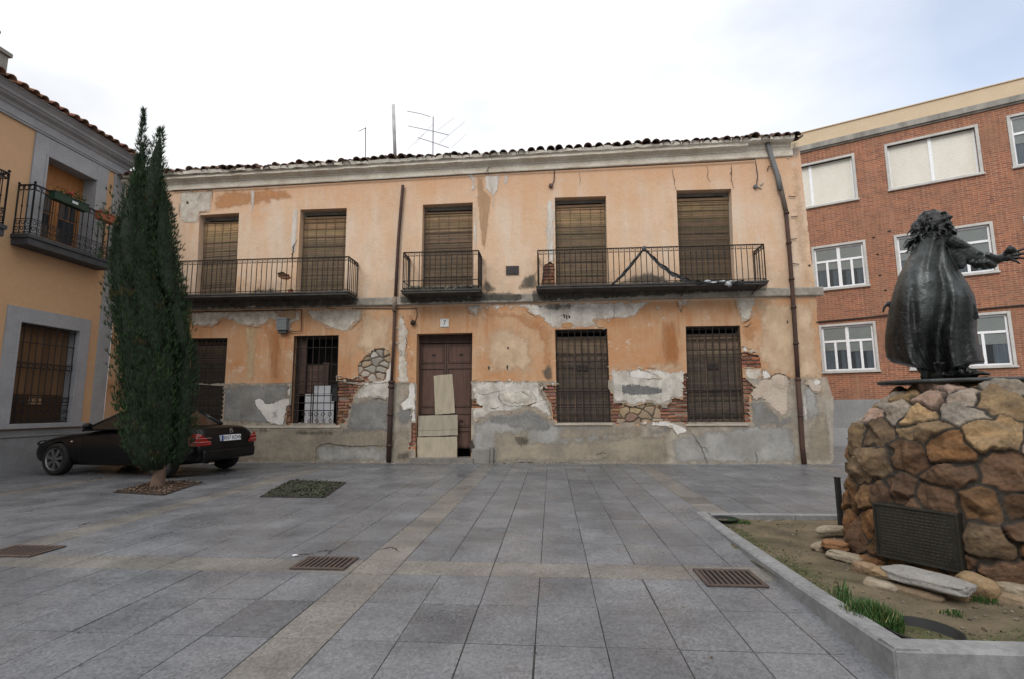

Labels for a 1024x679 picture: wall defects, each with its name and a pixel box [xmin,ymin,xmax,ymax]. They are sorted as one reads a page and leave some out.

flaking render [178,189,213,223]
water stain [469,175,508,244]
flaking render [191,307,362,331]
flaking render [467,300,665,330]
flaking render [255,384,291,425]
flaking render [336,315,416,449]
flaking render [472,365,557,422]
flaking render [608,366,688,435]
flaking render [741,346,789,422]